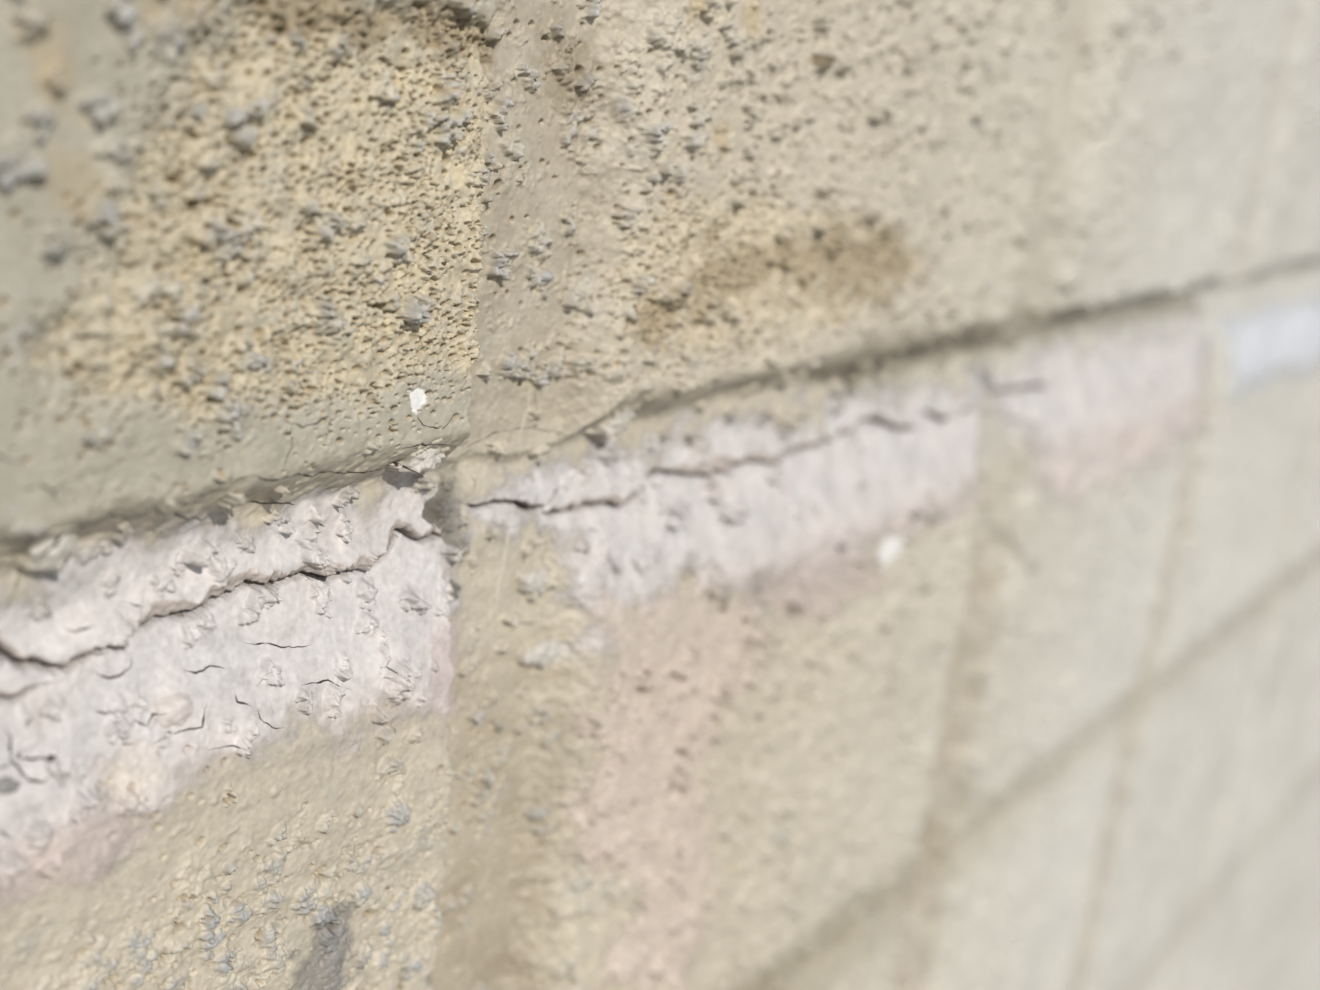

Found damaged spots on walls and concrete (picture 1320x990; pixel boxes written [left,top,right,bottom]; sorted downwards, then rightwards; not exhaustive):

spalling [30,0,503,424]
crack [0,381,1047,783]